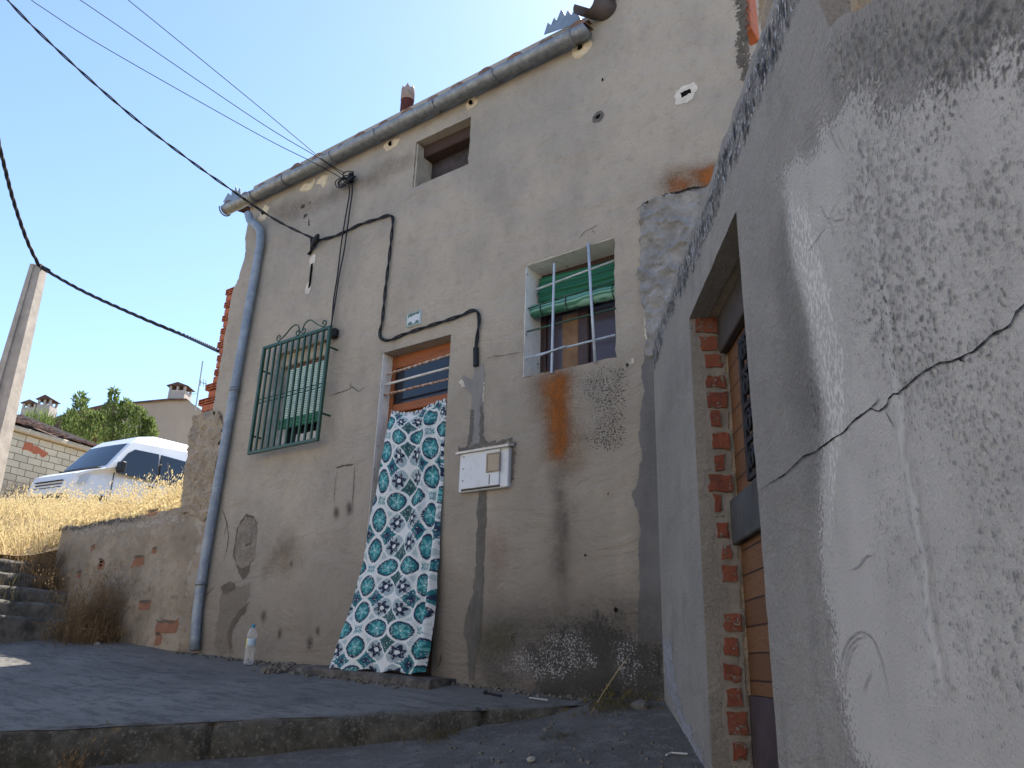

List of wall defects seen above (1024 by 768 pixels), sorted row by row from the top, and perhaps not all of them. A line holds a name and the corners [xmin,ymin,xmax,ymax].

rust [667,165,714,189]
peeling [637,0,795,369]
rust [544,375,570,465]
leakage [573,363,627,452]
crack [758,304,1024,496]
flaking render [153,619,179,646]
peeling [215,514,258,653]
leakage [488,612,709,768]